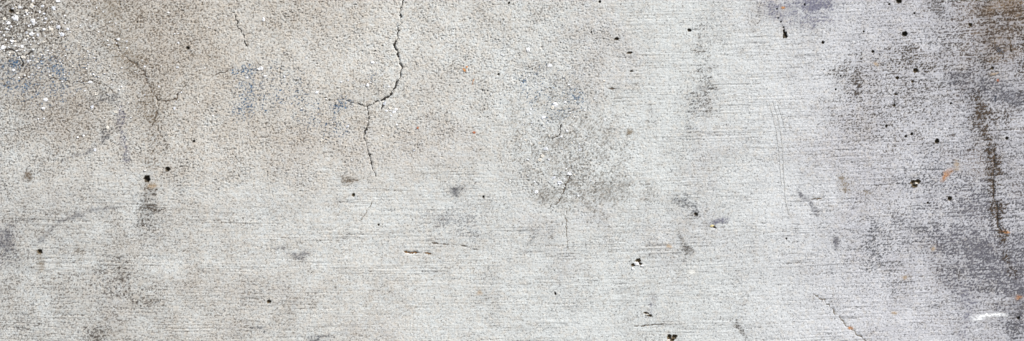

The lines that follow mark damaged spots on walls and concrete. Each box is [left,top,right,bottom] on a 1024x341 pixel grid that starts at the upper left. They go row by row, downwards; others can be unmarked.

crack [341,0,404,176]